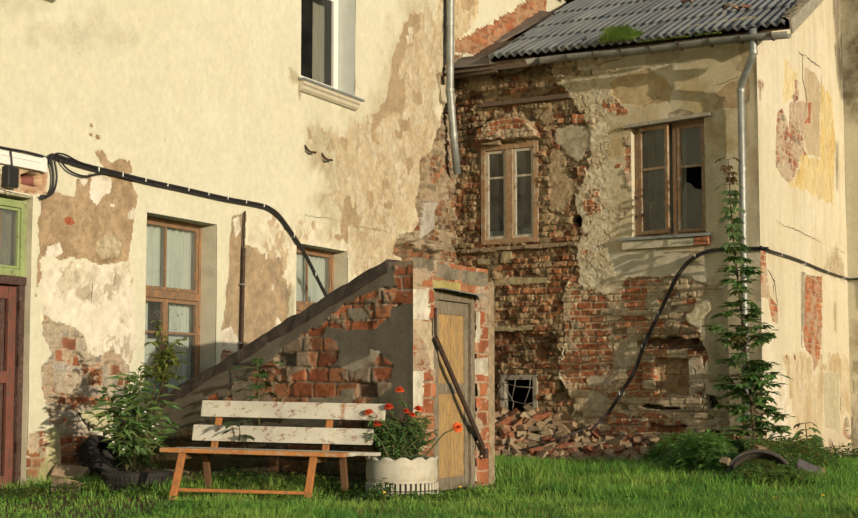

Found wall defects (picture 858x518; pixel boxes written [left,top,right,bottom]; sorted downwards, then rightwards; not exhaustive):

flaking render [13,122,138,485]
spalling [208,0,729,438]
flaking render [713,42,757,110]
peeling [776,59,836,205]
flaking render [769,272,851,452]
leakage [833,0,858,110]